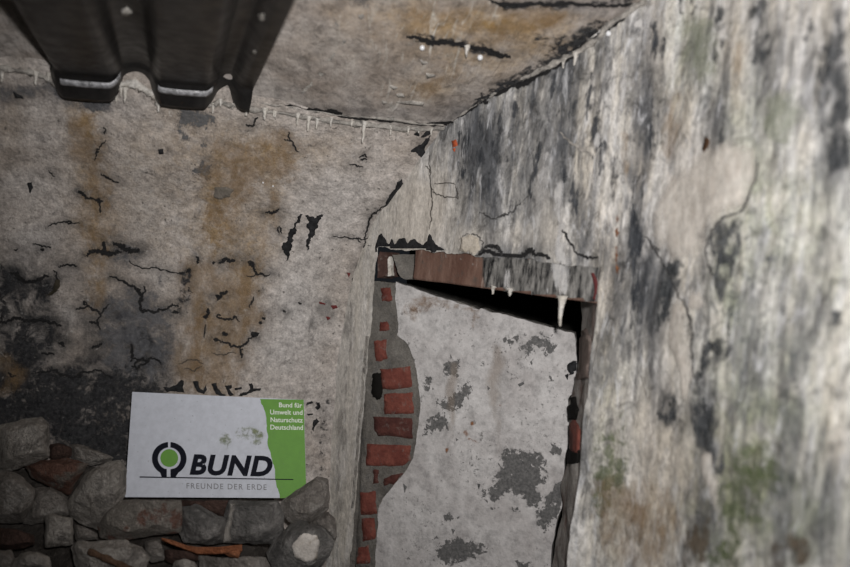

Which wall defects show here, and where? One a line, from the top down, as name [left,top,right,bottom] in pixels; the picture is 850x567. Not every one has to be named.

crack [285,0,633,127]
leakage [0,288,172,466]
crack [10,241,302,372]
crack [333,189,398,248]
crack [460,233,551,260]
peeling [495,331,557,365]
leakage [485,165,579,294]
leakage [620,204,642,308]
leakage [709,220,742,301]
spalling [351,321,473,567]
peeling [432,513,488,565]
peeling [477,443,562,533]